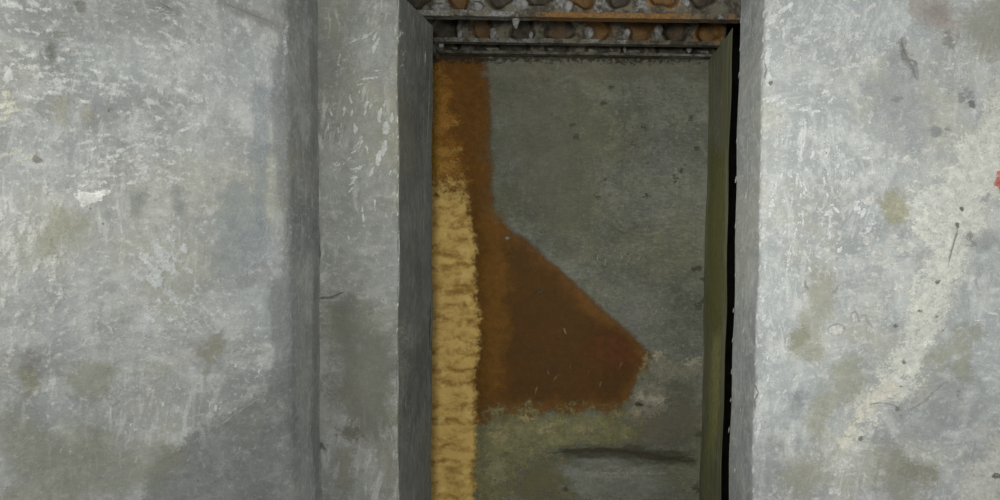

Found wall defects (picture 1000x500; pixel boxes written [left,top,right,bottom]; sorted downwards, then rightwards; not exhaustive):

corrosion [433,56,651,425]